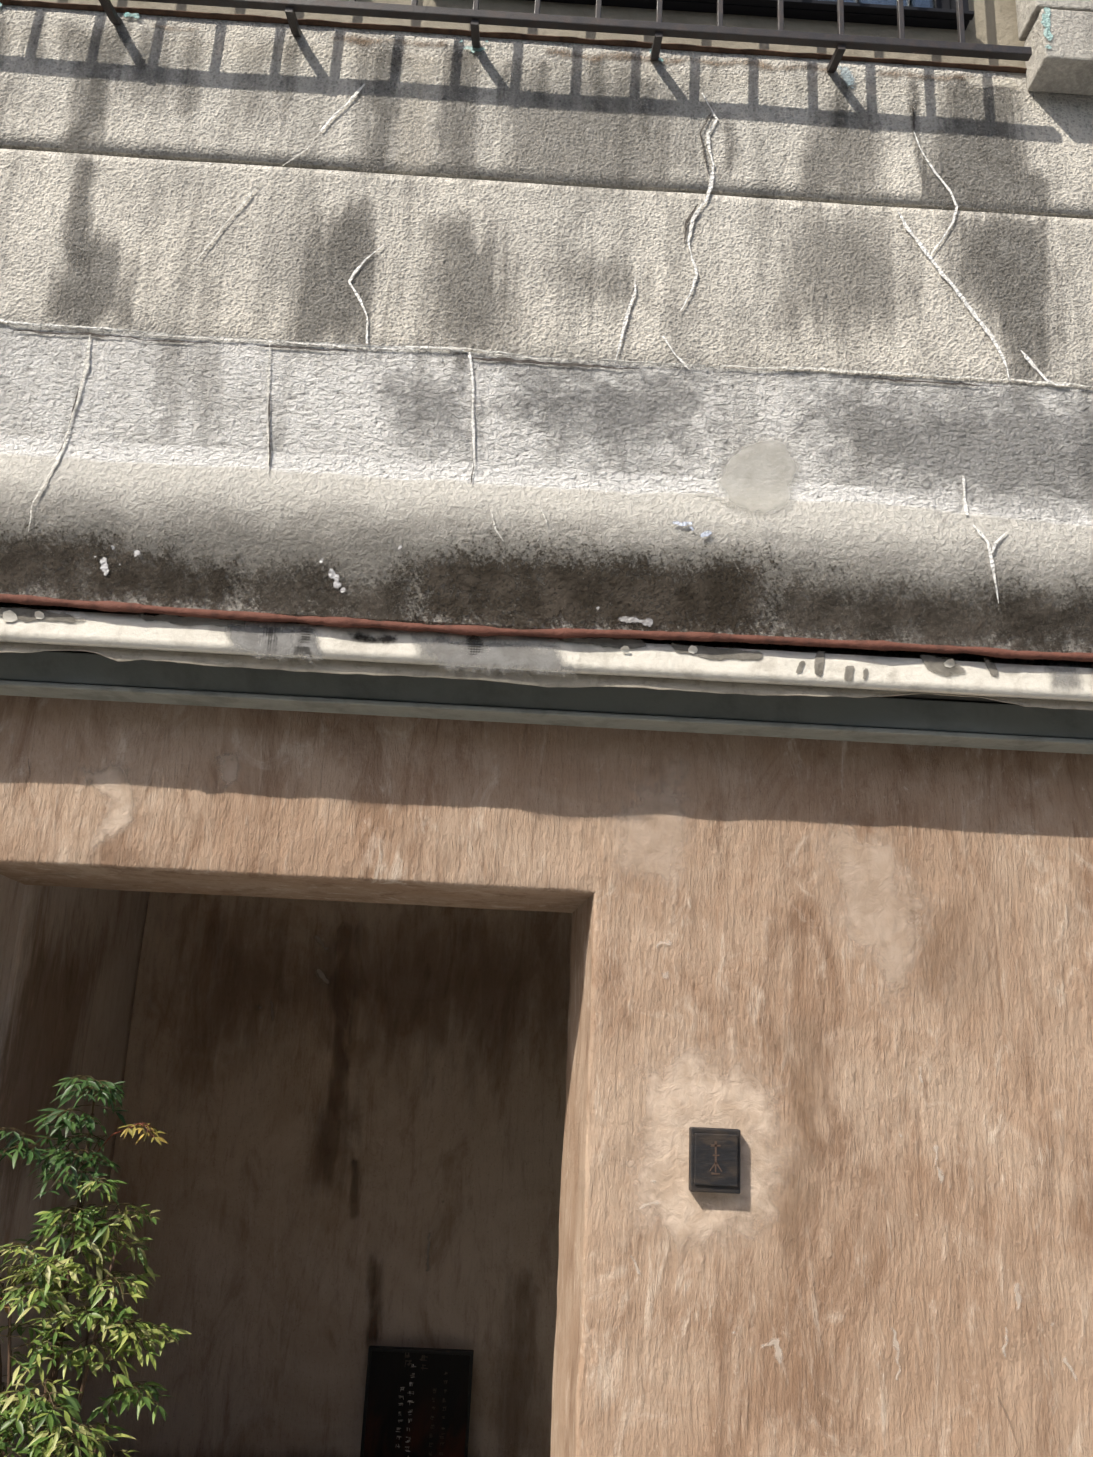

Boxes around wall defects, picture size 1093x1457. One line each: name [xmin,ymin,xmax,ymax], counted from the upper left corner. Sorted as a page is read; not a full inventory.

damp [47,26,132,330]
damp [295,200,375,351]
damp [361,45,403,170]
damp [439,47,476,174]
damp [431,220,506,360]
crack [0,84,1093,541]
damp [911,78,1062,375]
damp [512,377,695,438]
damp [0,519,1093,668]
crack [962,476,1007,603]